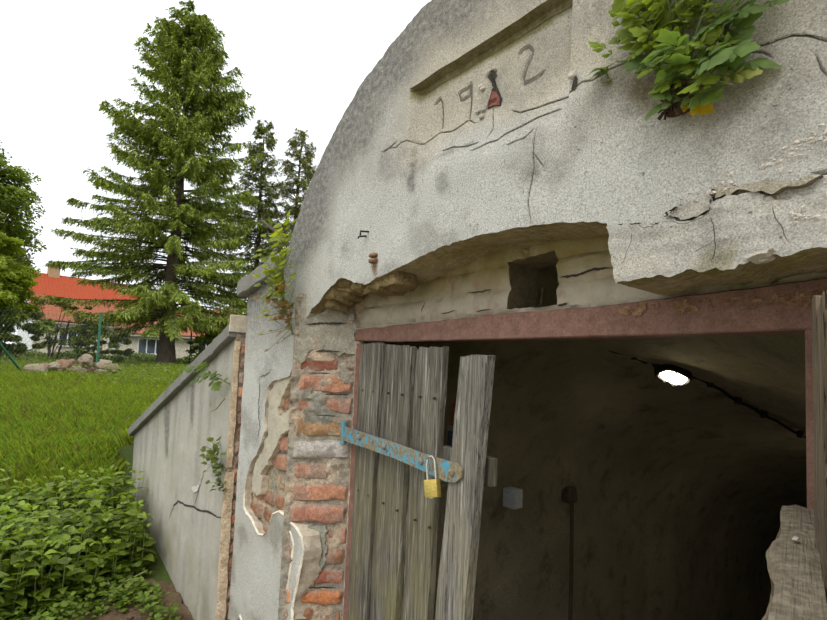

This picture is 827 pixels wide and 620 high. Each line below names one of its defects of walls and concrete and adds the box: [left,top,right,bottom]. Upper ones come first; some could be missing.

crack [751,35,827,74]
crack [384,63,624,219]
crack [763,193,790,243]
peeling [744,249,776,264]
flaking render [324,271,418,312]
crack [168,475,221,521]
flaking render [215,341,305,620]